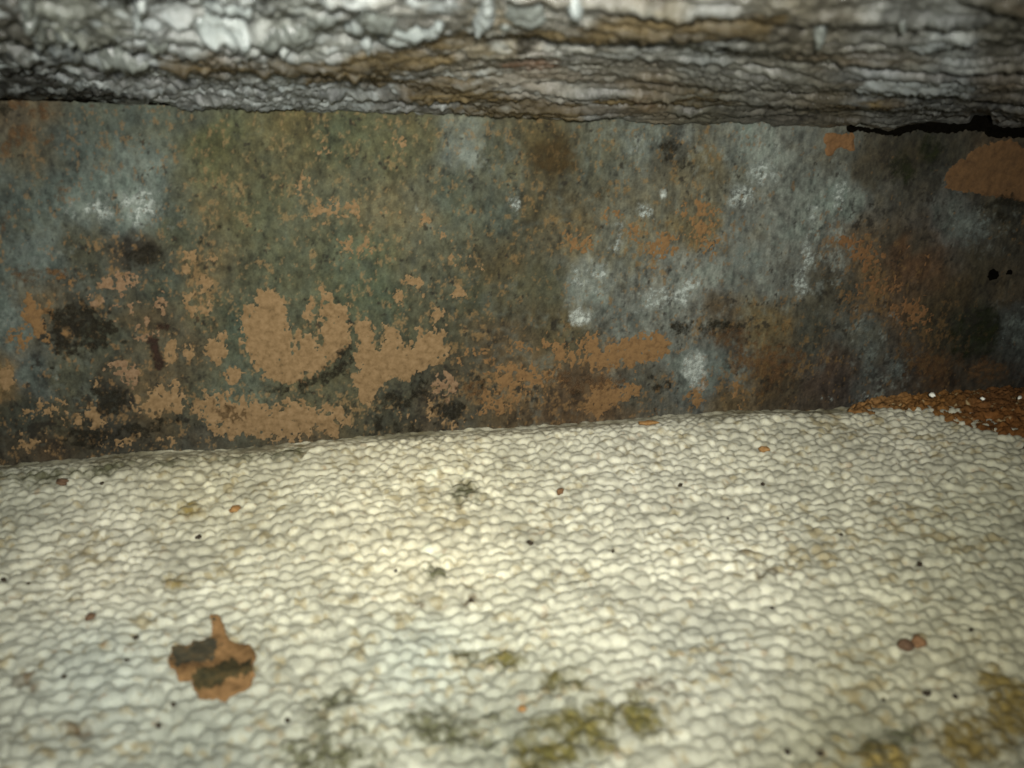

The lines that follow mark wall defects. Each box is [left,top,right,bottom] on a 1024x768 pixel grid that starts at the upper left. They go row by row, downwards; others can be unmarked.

efflorescence [85,192,112,218]
efflorescence [122,191,154,226]
efflorescence [729,165,775,206]
peeling [944,138,1024,202]
efflorescence [645,280,700,308]
peeling [6,292,71,351]
mould [44,298,126,369]
mould [671,320,741,335]
mould [269,348,352,393]
peeling [22,270,672,447]
mould [430,397,466,430]
peeling [11,430,50,454]